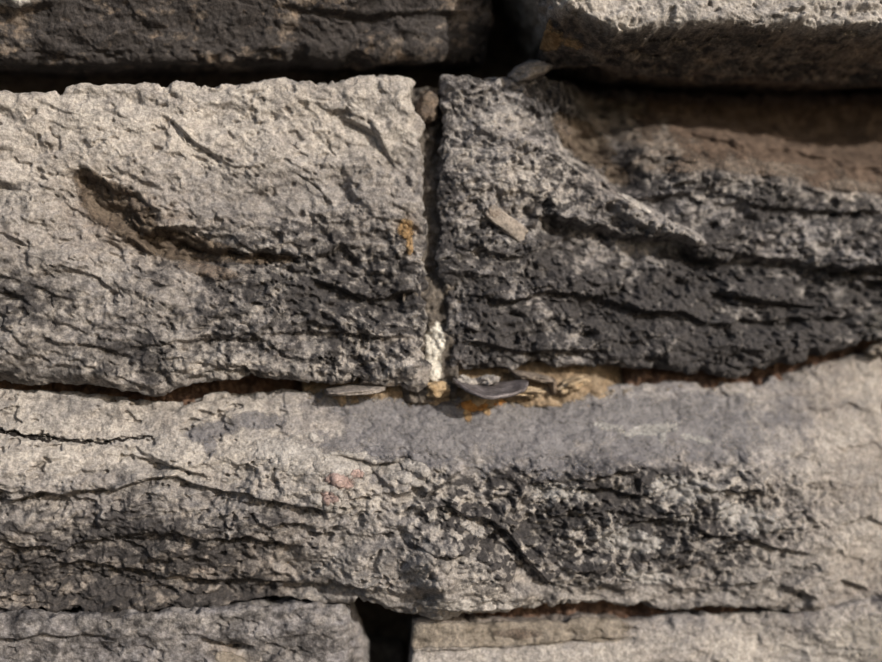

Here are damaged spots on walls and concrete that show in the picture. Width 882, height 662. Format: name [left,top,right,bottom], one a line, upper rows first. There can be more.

crack [0,429,153,445]